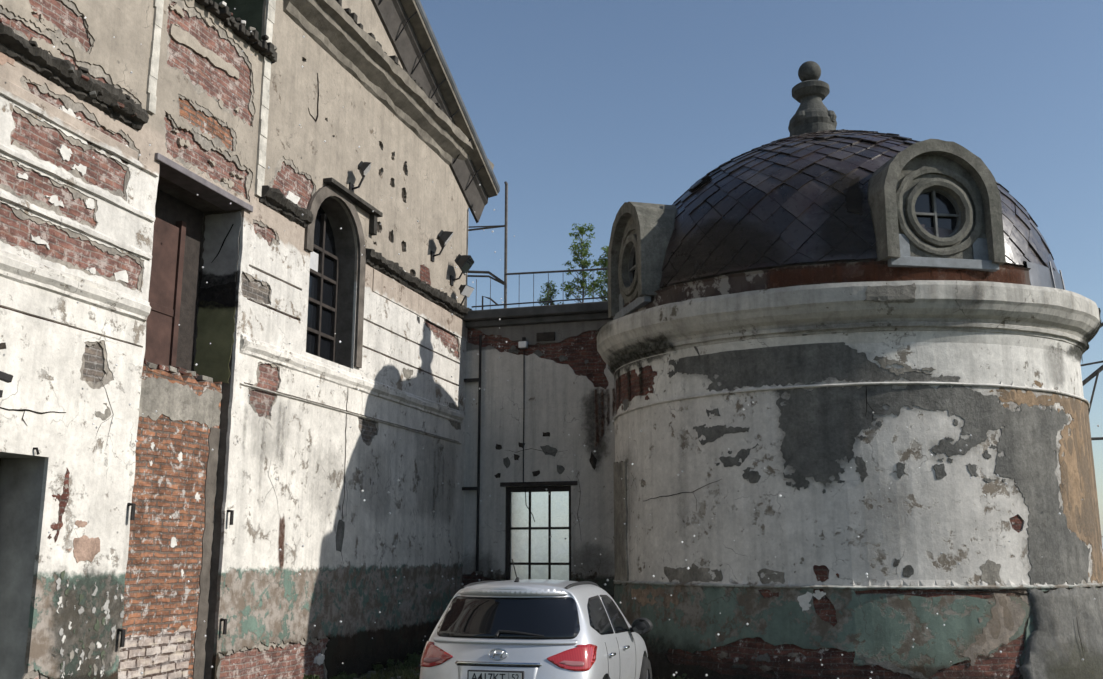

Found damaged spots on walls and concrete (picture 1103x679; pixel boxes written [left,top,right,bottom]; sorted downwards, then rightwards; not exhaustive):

spalling [219,1,269,41]
flaking render [0,0,144,292]
flaking render [164,0,255,202]
crack [0,407,66,425]
flaking render [80,340,113,389]
flaking render [248,362,280,420]
flaking render [417,319,657,414]
crack [632,477,721,511]
flaking render [989,380,1103,583]
peeling [48,468,125,679]
flaking render [217,636,330,679]
flaking render [667,558,1030,679]